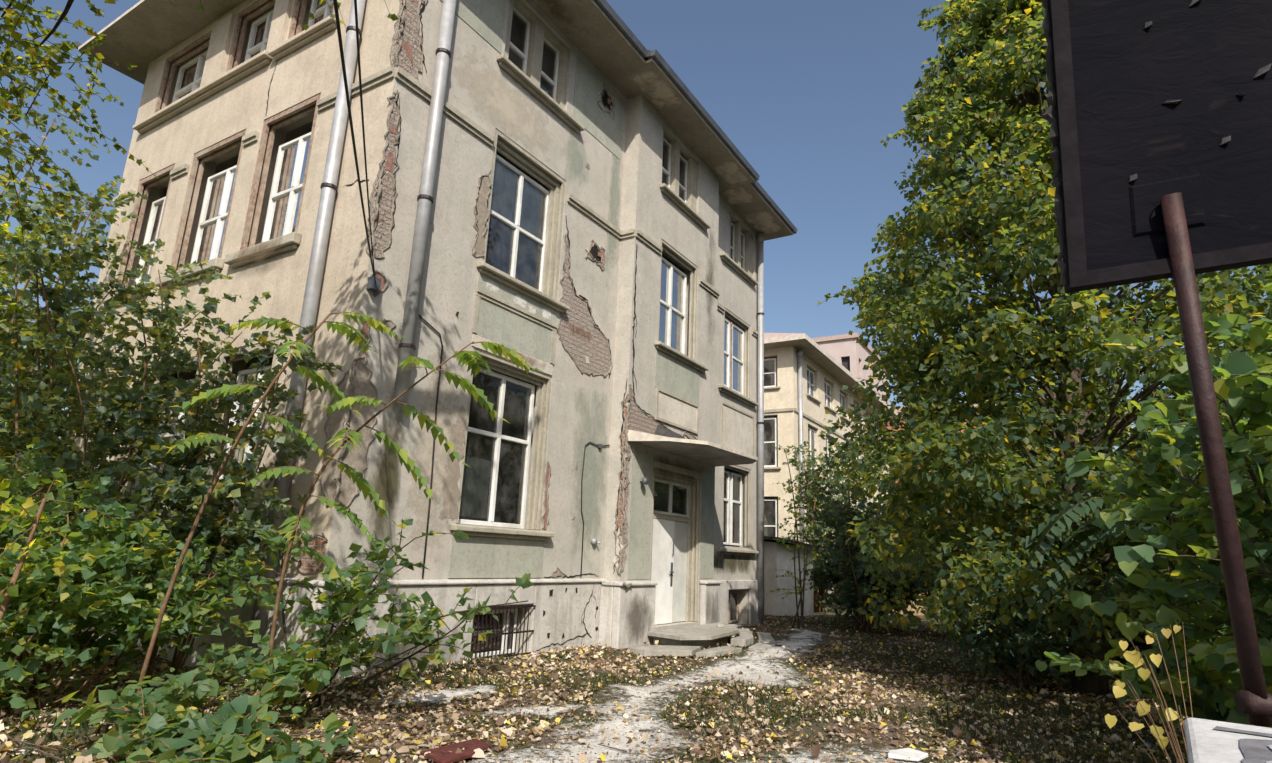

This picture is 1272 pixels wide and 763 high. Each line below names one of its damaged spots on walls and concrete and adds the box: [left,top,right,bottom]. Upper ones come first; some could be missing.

flaking render [389,0,428,81]
spalling [597,84,615,119]
flaking render [366,89,402,297]
flaking render [472,171,492,258]
peeling [486,280,499,294]
flaking render [514,216,613,378]
flaking render [319,317,397,507]
peeling [541,460,551,530]
spalling [612,381,661,589]
flaking render [290,532,328,575]
water stain [630,601,646,636]